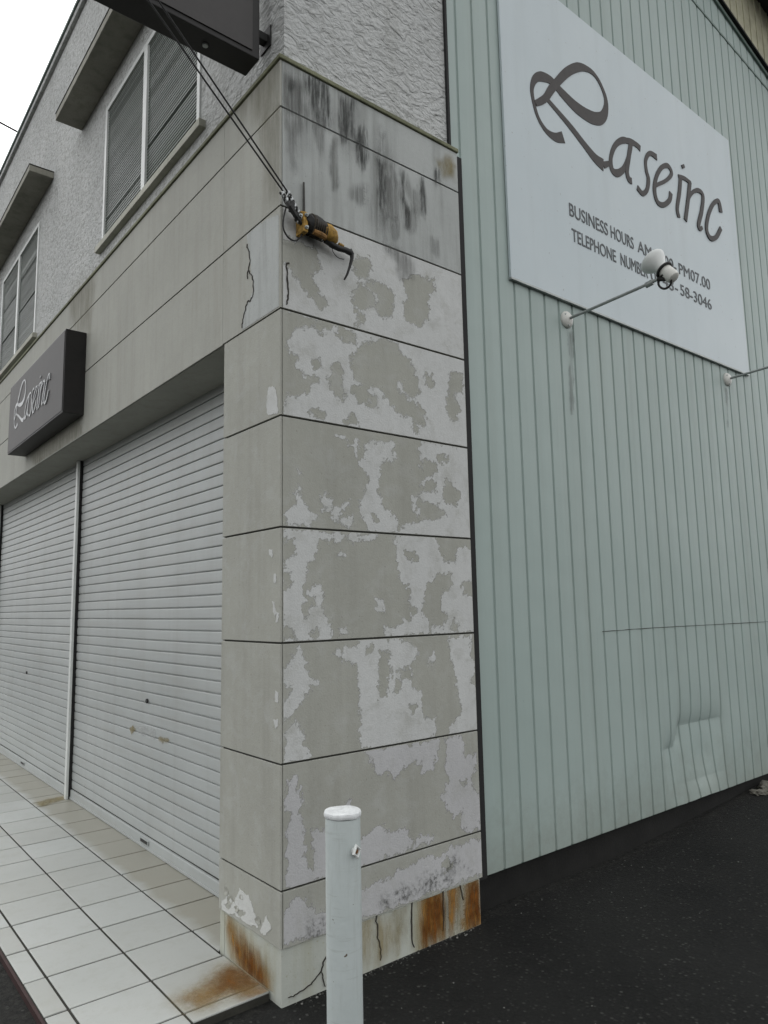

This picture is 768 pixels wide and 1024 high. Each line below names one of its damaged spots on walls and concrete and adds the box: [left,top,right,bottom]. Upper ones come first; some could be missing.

damp [308,75,440,229]
crack [241,244,254,328]
crack [283,262,291,305]
peeling [242,207,482,917]
peeling [284,775,326,945]
corrosion [195,925,267,1002]
spalling [221,886,271,935]
crack [288,957,326,998]
crack [374,916,382,961]
corrosion [422,881,481,948]